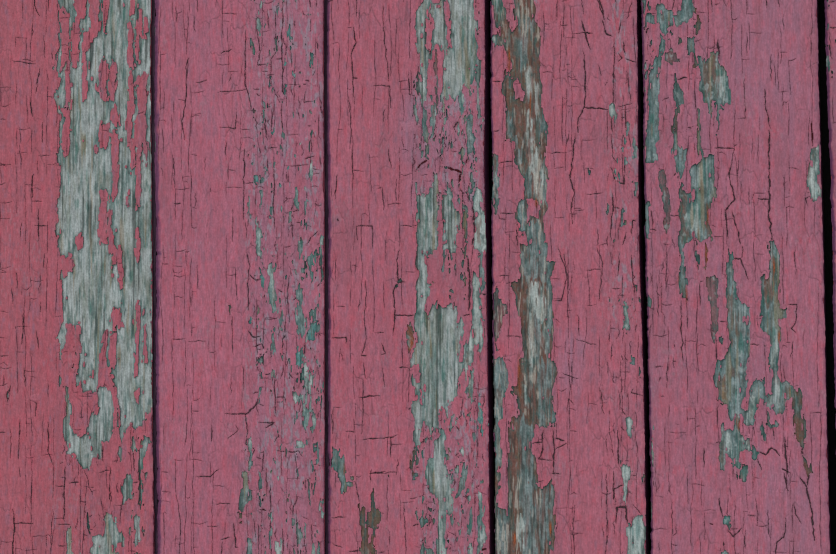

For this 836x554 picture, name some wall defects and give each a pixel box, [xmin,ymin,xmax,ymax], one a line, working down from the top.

crack [3,0,53,308]
peeling [53,0,156,554]
crack [208,373,320,554]
crack [304,251,412,497]
crack [335,146,404,248]
peeling [358,488,381,554]
crack [455,207,486,316]
peeling [406,0,558,554]
crack [532,433,564,474]
crack [600,389,643,552]
peeling [609,0,813,482]
crack [717,58,772,278]